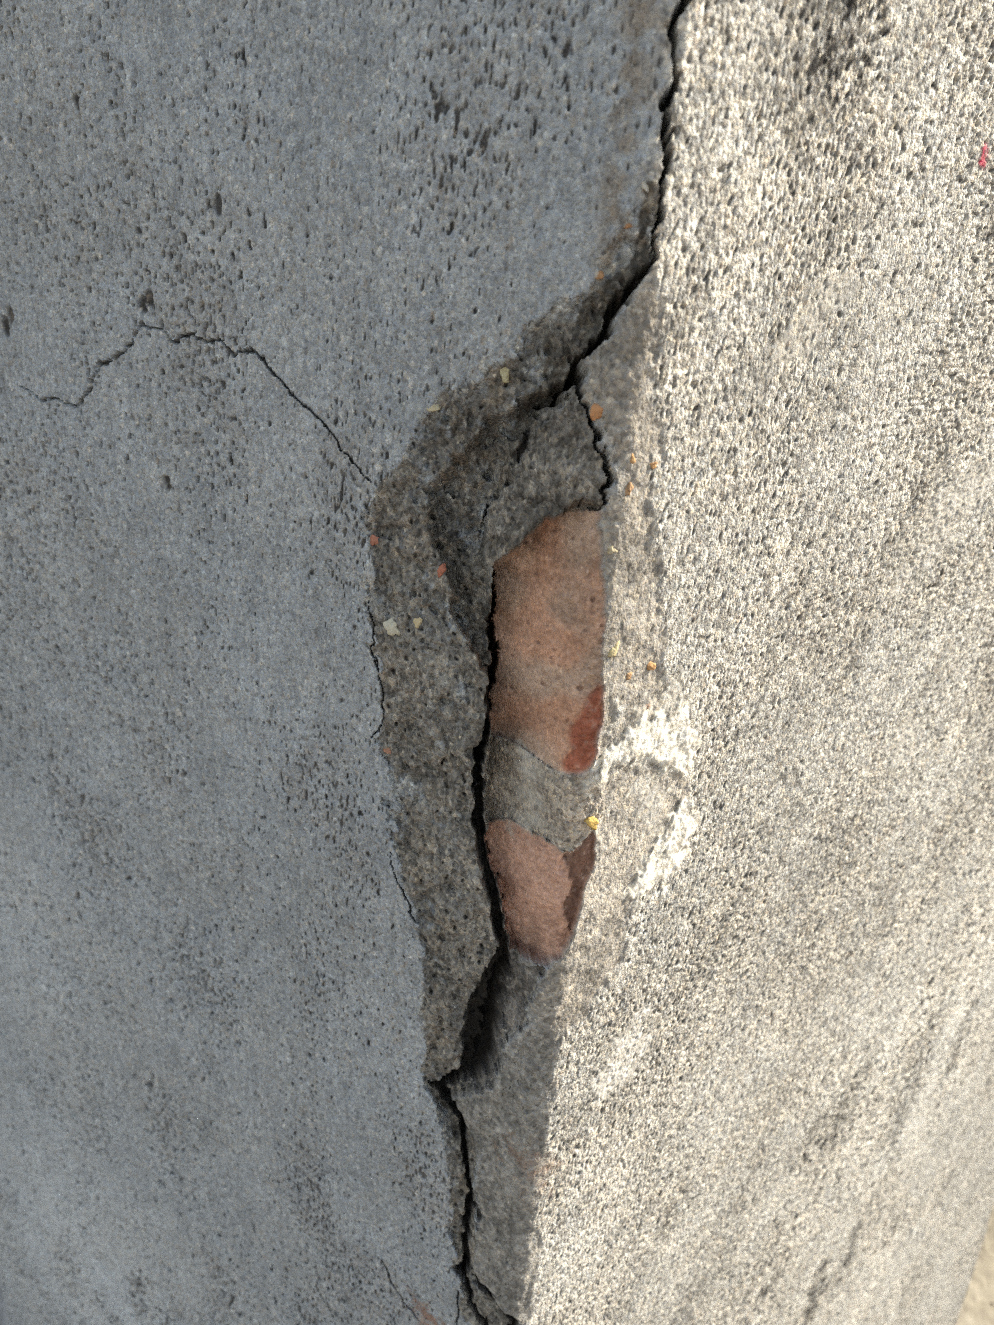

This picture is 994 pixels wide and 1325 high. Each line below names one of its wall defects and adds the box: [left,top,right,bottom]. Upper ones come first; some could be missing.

crack [516,0,692,511]
crack [19,319,372,484]
crack [367,600,385,739]
spalling [361,180,698,1325]
crack [389,852,420,925]
crack [427,565,519,1325]
crack [381,1259,420,1323]